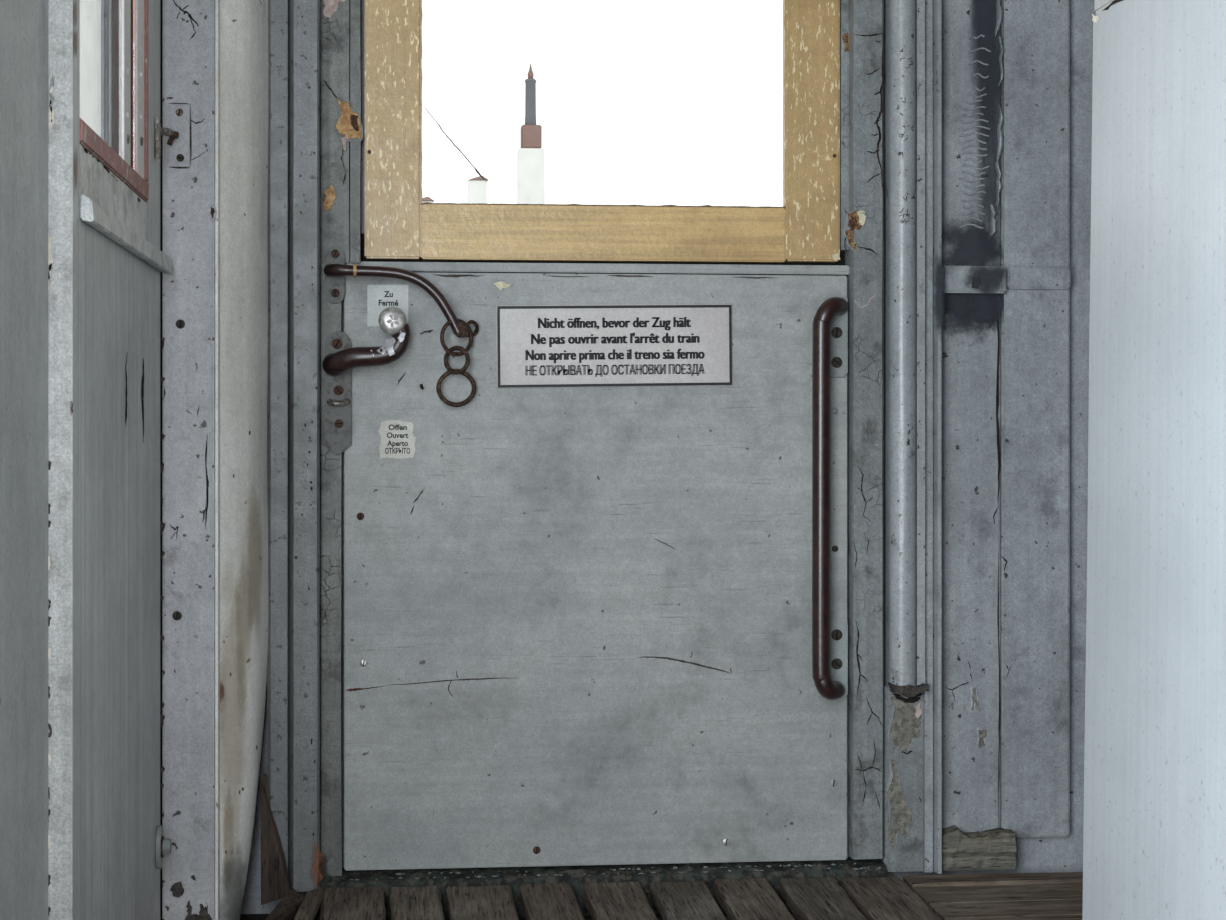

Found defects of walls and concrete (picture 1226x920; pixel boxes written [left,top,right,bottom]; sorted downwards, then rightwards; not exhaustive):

peeling [322,0,347,21]
peeling [334,97,363,150]
crack [854,33,915,222]
damp [934,0,1005,332]
crack [125,354,144,440]